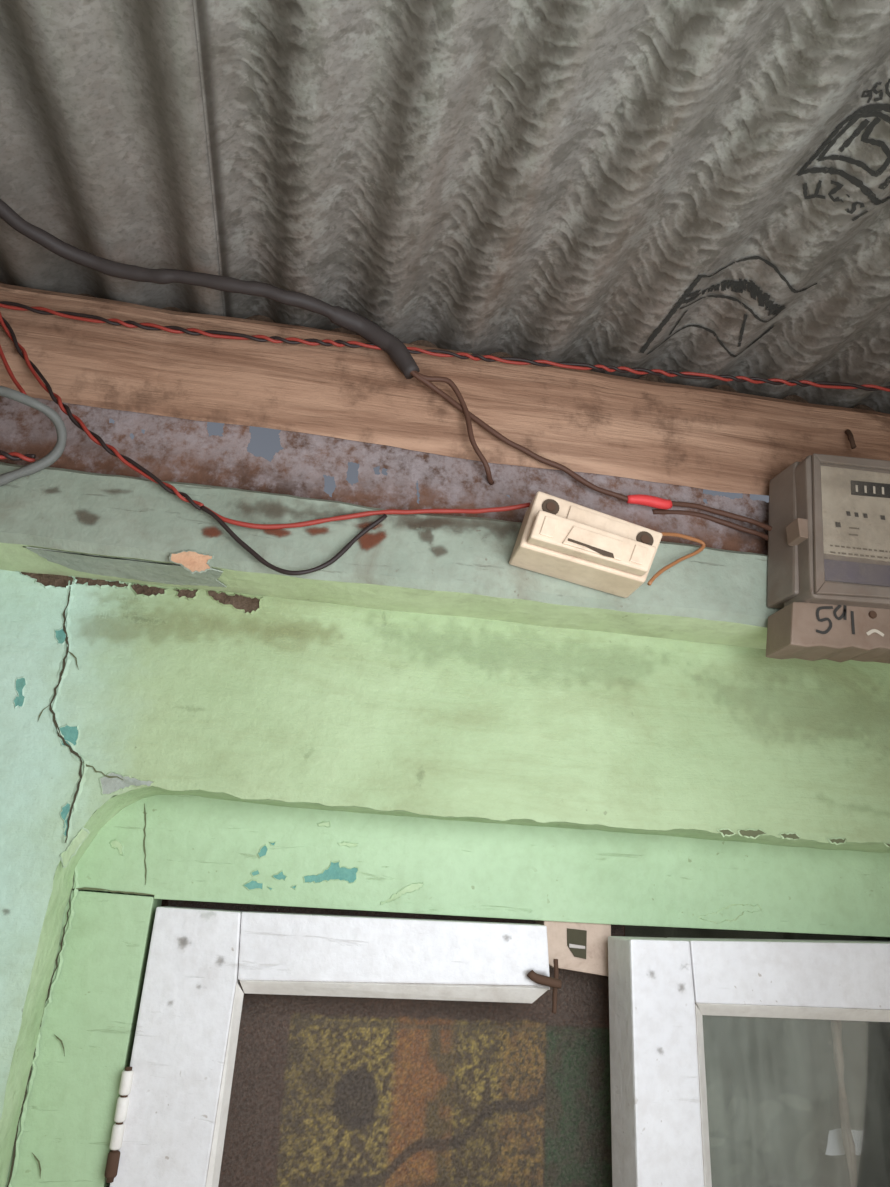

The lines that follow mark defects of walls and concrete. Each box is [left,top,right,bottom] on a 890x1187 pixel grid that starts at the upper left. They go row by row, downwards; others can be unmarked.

rust [0,396,769,555]
peeling [16,546,265,615]
crack [7,580,152,1187]
peeling [242,842,359,892]